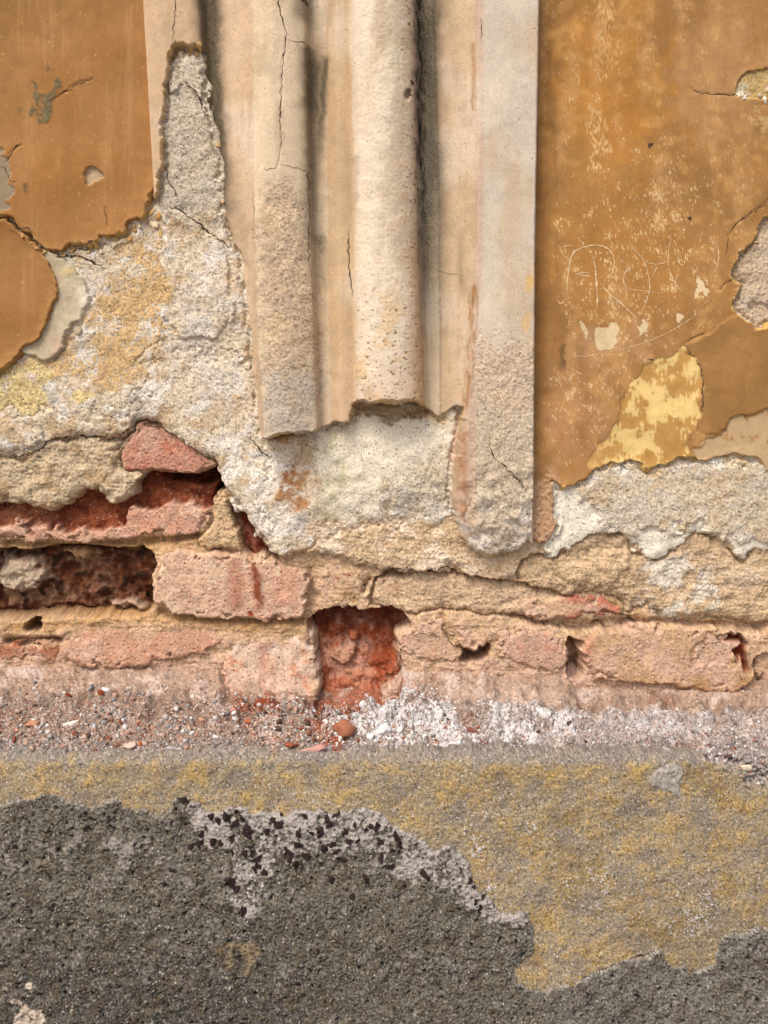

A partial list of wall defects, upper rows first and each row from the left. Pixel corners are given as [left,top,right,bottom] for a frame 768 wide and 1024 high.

crack [167,79,205,118]
crack [264,0,311,266]
flaking render [735,69,768,104]
crack [166,168,255,249]
flaking render [0,42,462,559]
peeling [580,321,619,351]
flaking render [731,217,768,328]
flaking render [542,346,768,559]
spalling [0,544,157,611]
spalling [313,605,406,693]
peeling [0,797,529,928]
spalling [3,982,45,1024]